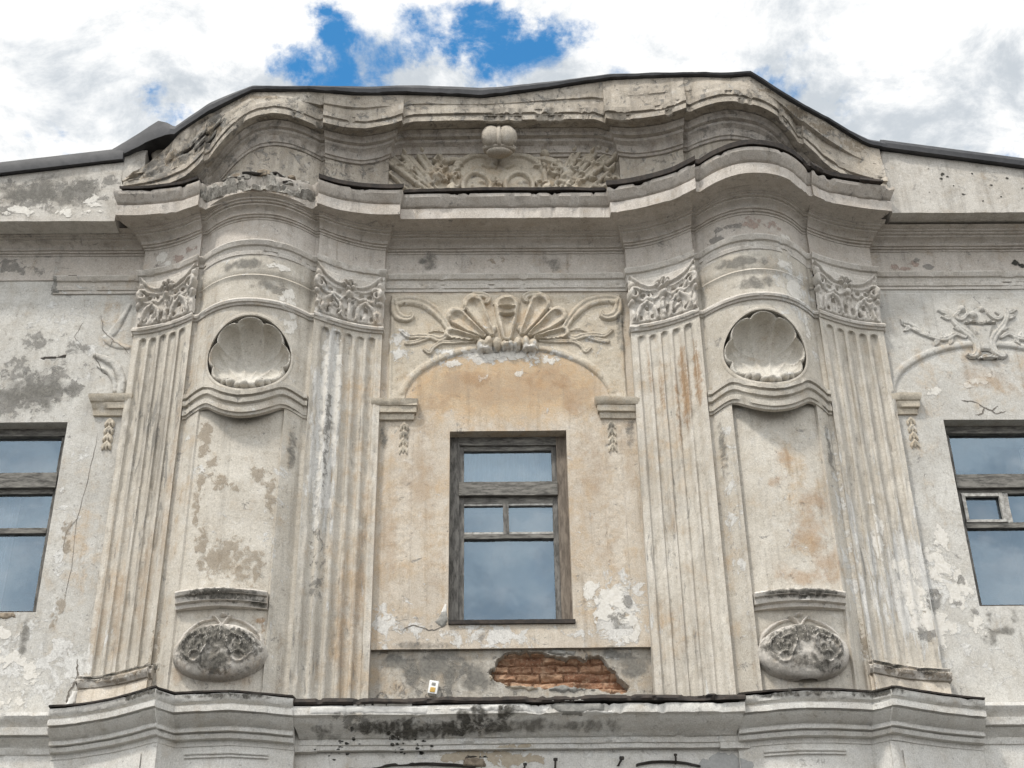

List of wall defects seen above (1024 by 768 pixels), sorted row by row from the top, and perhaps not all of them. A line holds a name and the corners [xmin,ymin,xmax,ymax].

flaking render [1,181,103,218]
spalling [201,169,317,202]
crack [962,400,1005,416]
crack [63,433,98,595]
peeling [866,494,993,649]
flaking render [402,604,448,632]
peeling [583,579,641,643]
peeling [0,612,40,708]
flaking render [310,648,627,716]
leakage [314,704,543,761]